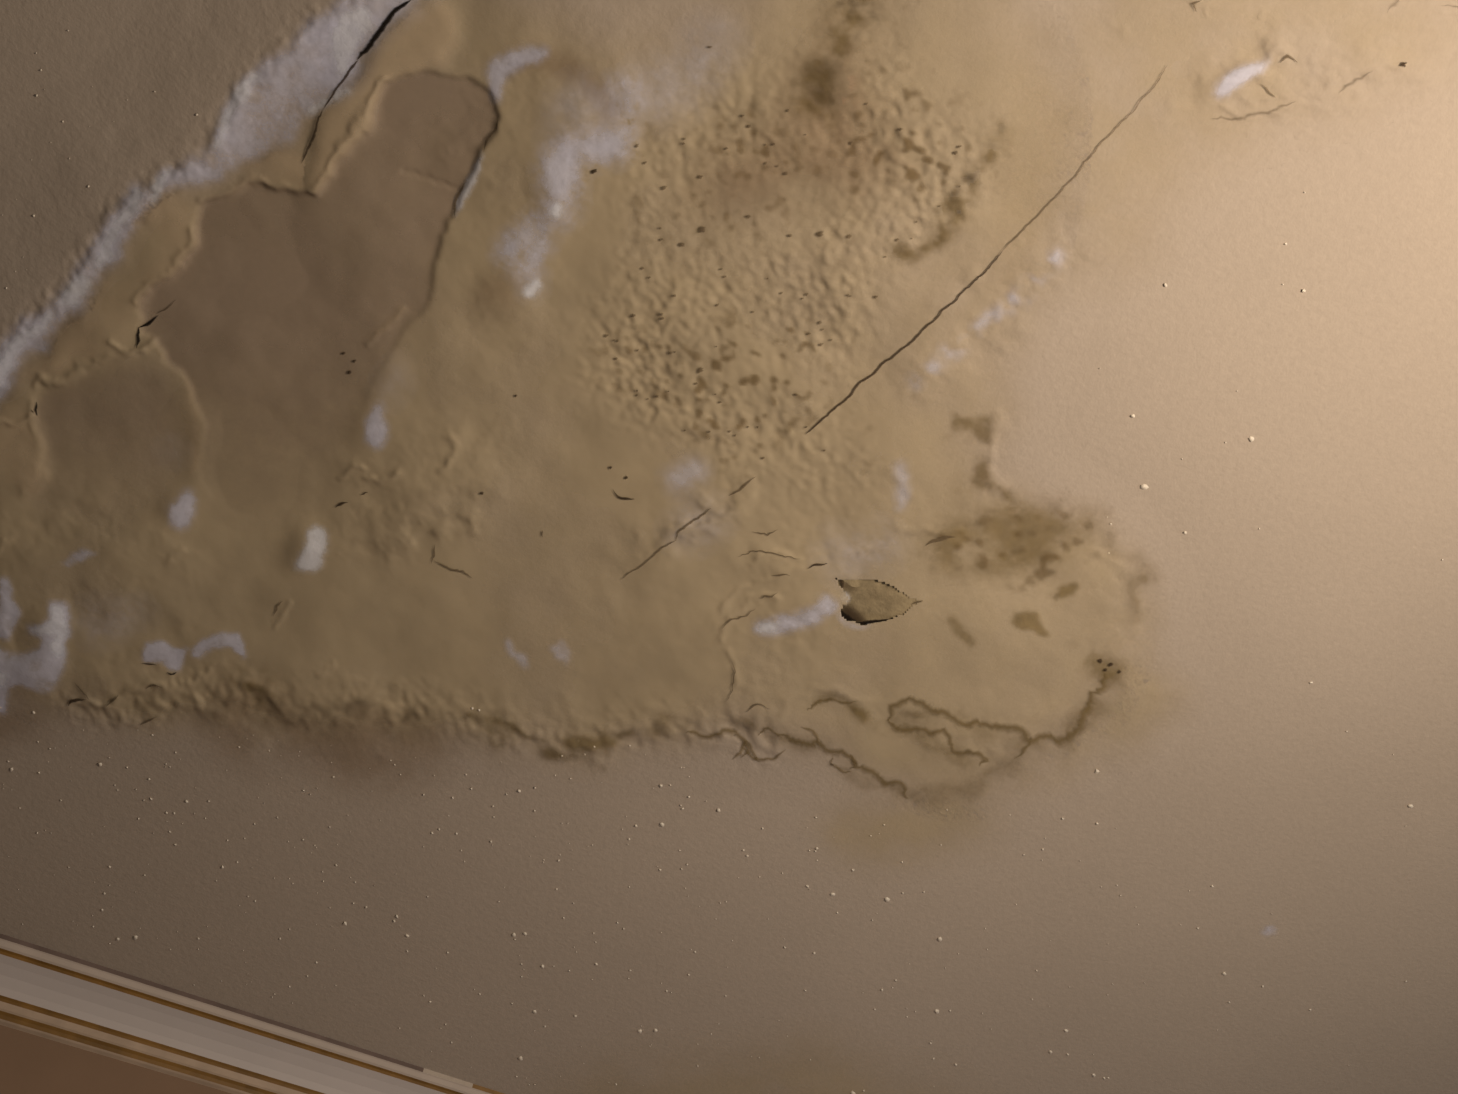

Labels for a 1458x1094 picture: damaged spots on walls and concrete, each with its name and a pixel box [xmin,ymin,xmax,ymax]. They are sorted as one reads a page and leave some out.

crack [302,0,411,162]
crack [805,69,1165,435]
peeling [298,529,325,569]
crack [623,477,755,578]
peeling [0,583,67,710]
peeling [145,636,243,668]
damp [689,727,907,798]
damp [887,675,1106,764]